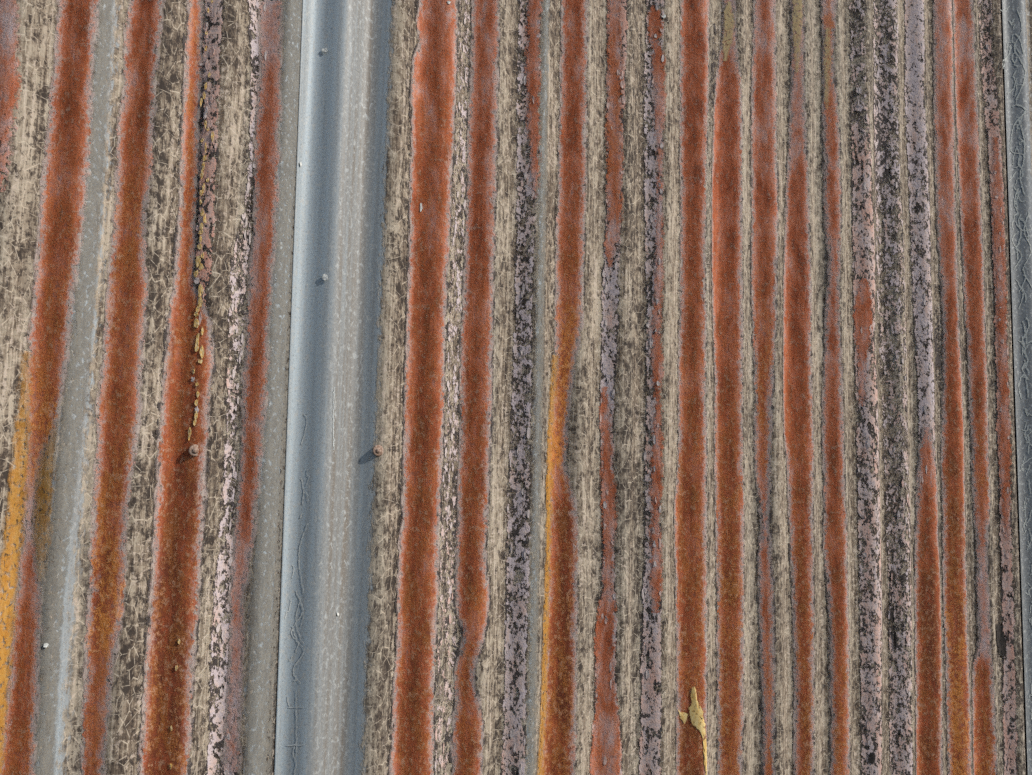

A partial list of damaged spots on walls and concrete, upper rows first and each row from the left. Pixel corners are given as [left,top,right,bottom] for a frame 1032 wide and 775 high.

corrosion [0,0,100,775]
corrosion [80,0,166,775]
corrosion [136,0,217,775]
corrosion [221,1,284,772]
corrosion [388,0,501,775]
corrosion [540,0,625,775]
corrosion [647,0,873,775]
peeling [849,0,935,775]
corrosion [913,0,1012,775]